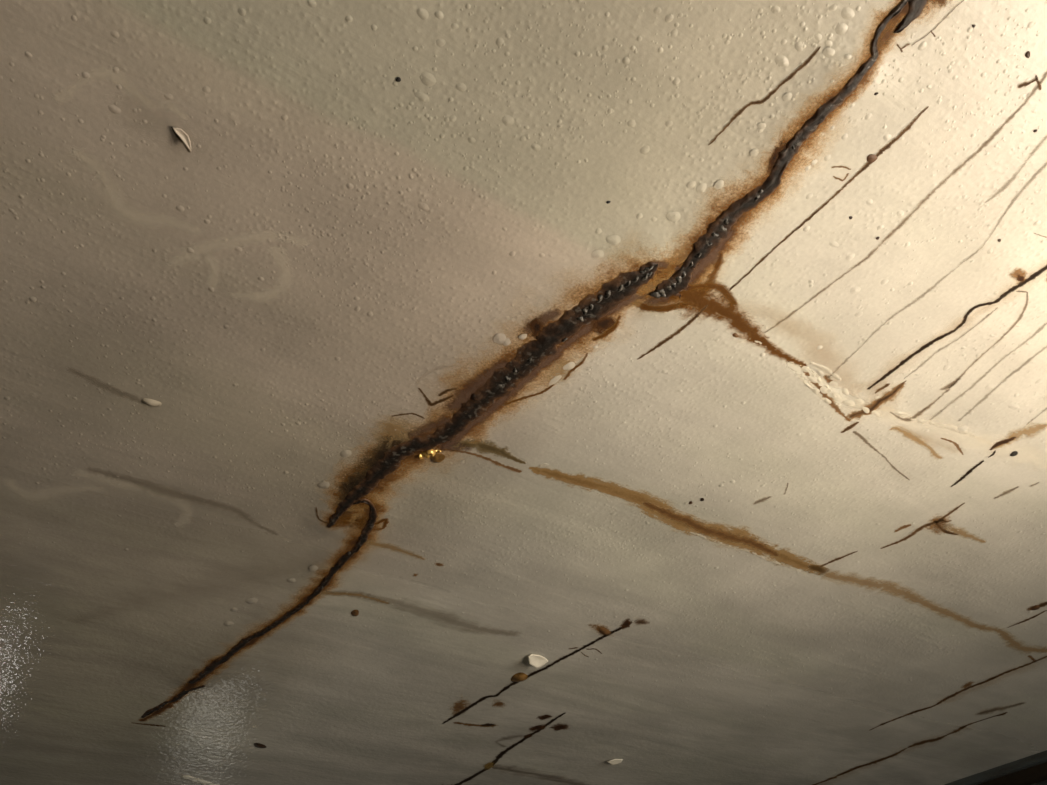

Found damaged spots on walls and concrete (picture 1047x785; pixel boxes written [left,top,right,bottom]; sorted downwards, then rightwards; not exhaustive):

crack [897,0,964,52]
crack [882,72,1047,243]
crack [134,0,946,727]
peeling [787,362,994,446]
crack [841,265,1047,480]
crack [821,503,985,567]
crack [442,619,646,785]
crack [813,703,1024,785]
crack [871,655,1047,730]